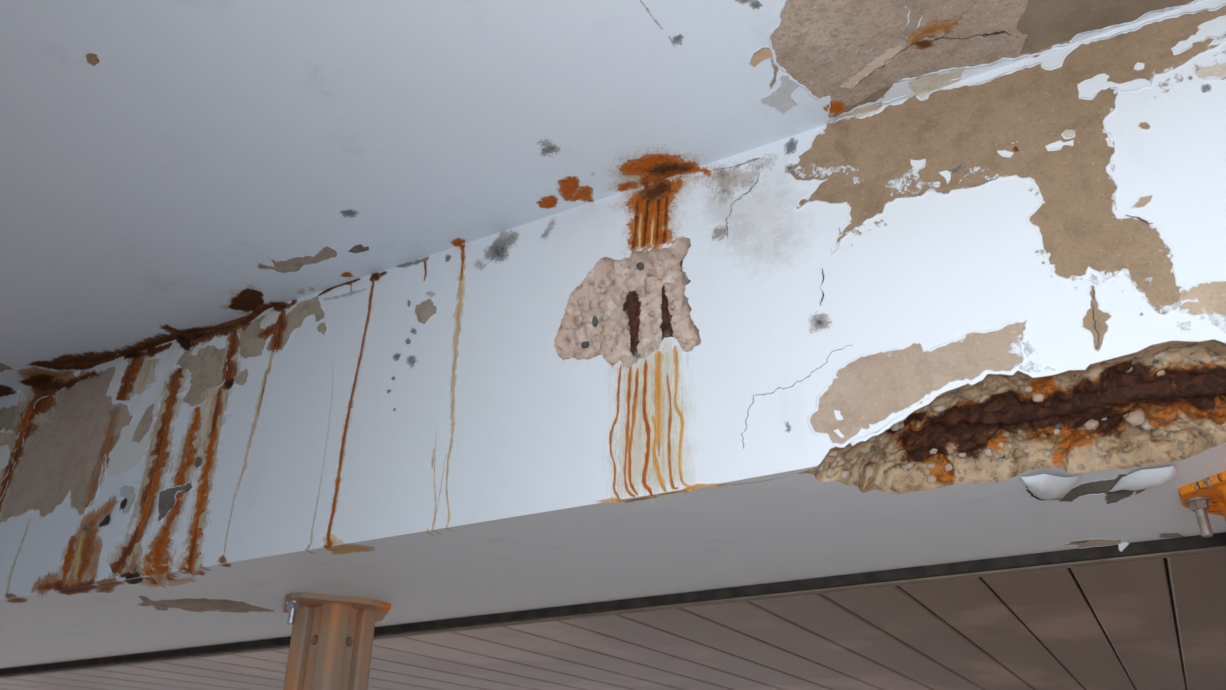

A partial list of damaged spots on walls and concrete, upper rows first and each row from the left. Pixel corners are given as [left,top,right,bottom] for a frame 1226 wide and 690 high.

peeling [0,361,155,527]
peeling [157,457,202,525]
corrosion [0,257,429,603]
peeling [175,294,329,409]
corrosion [426,238,466,536]
corrosion [536,173,594,209]
spalling [554,236,701,368]
corrosion [616,152,712,253]
corrosion [602,346,740,503]
peeling [747,0,1226,505]